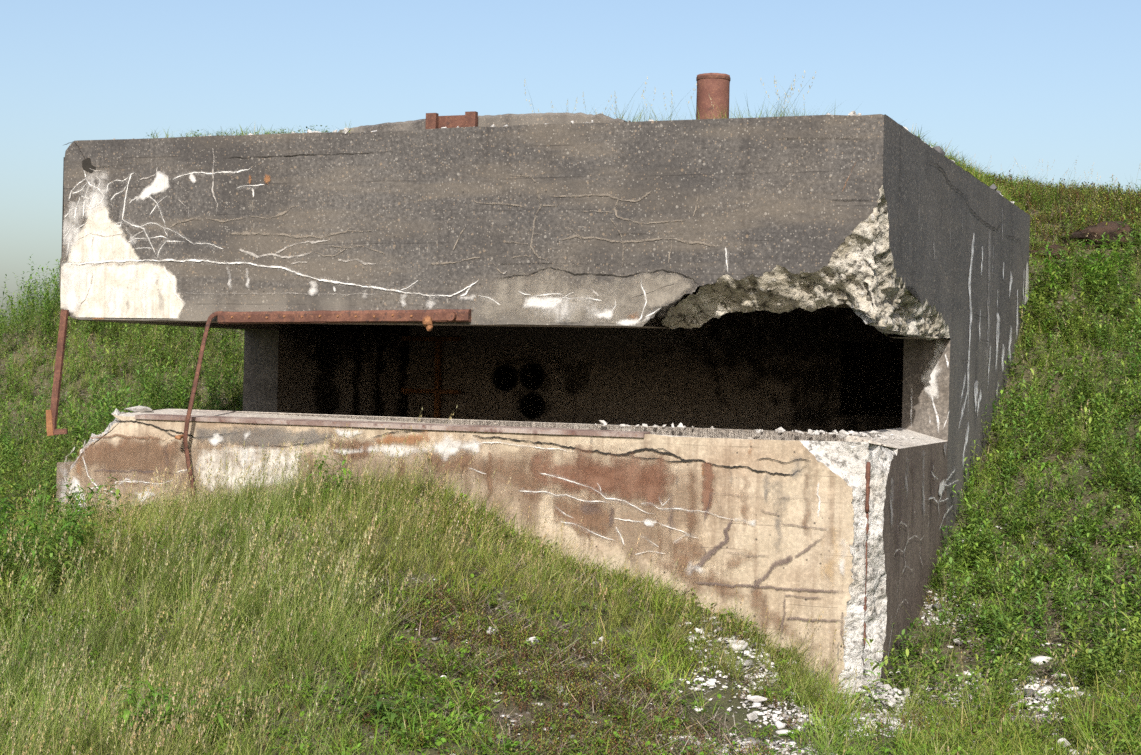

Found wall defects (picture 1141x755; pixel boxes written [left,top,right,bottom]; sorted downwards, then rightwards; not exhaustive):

peeling [64,182,139,266]
crack [65,142,728,326]
spalling [482,185,950,340]
rust [397,448,714,543]
crack [470,435,810,555]
spalling [800,440,898,696]
crack [888,466,958,655]